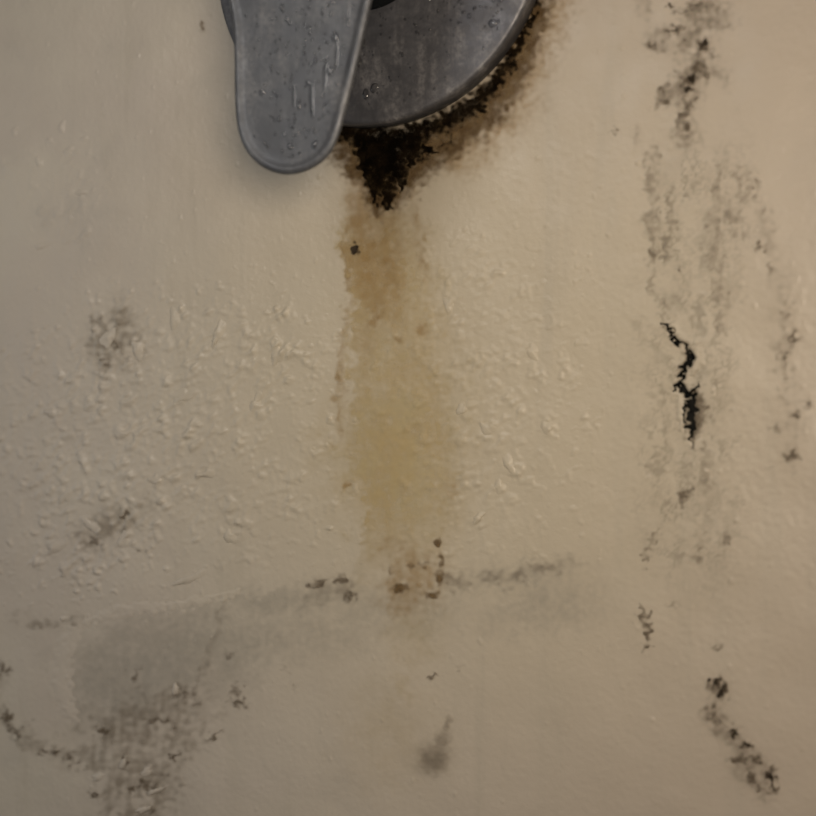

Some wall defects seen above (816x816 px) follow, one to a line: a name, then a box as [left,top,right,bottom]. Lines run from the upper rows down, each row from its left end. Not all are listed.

mould [682,62,706,92]
mould [335,0,546,217]
crack [660,323,708,448]
mould [708,678,728,707]
mould [732,742,779,792]